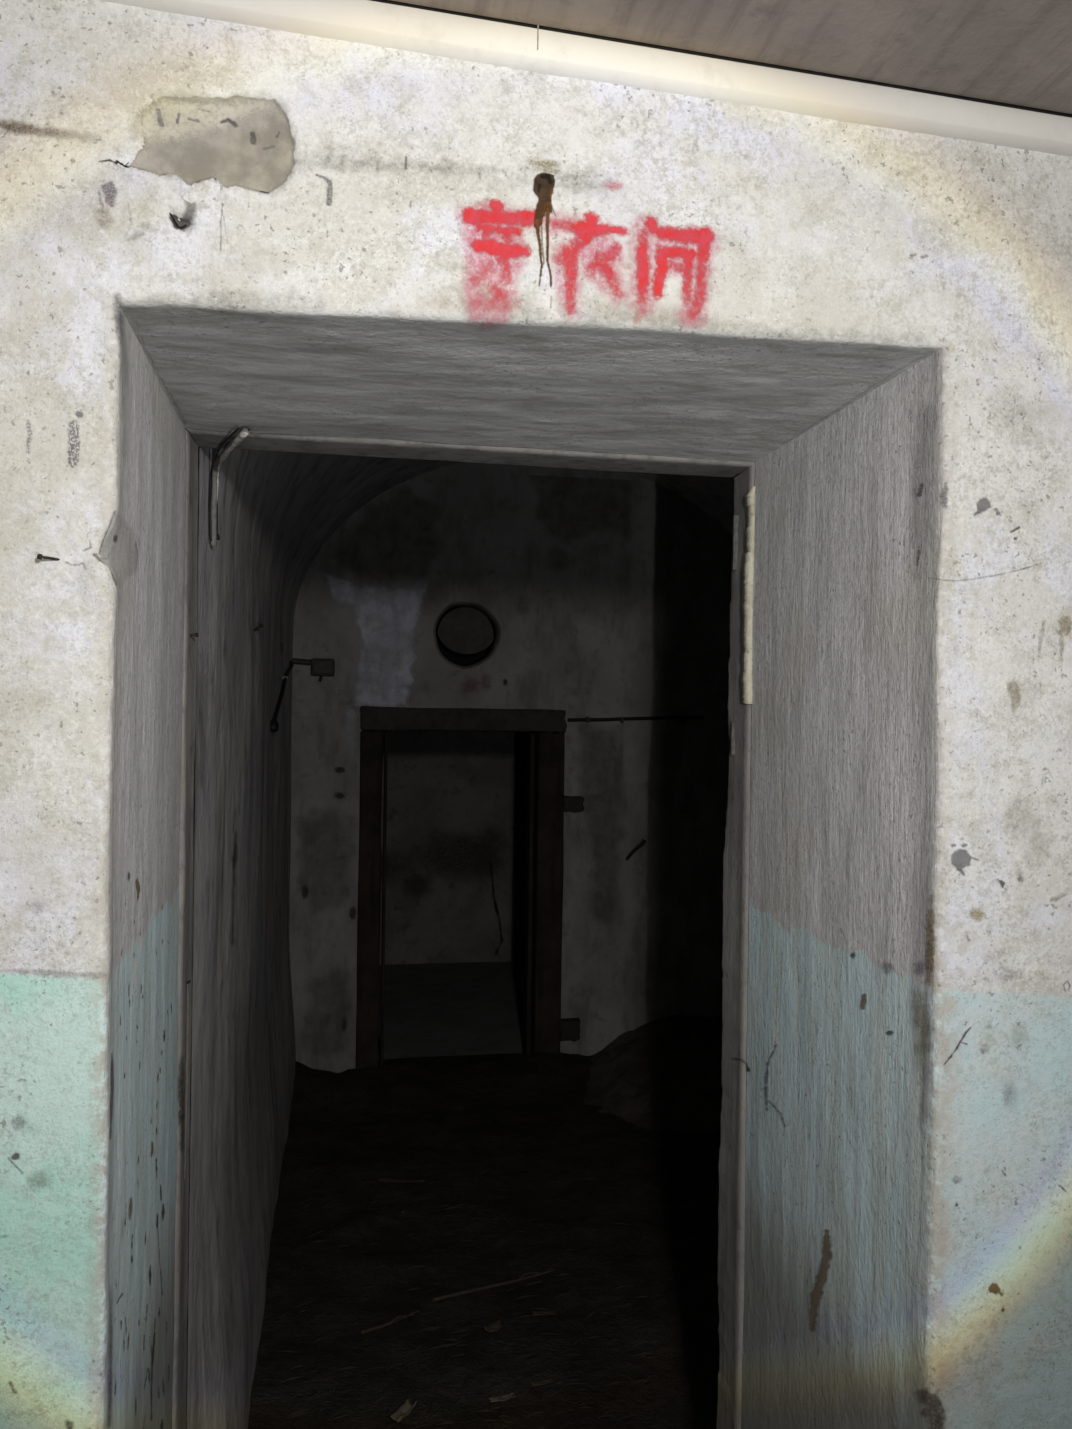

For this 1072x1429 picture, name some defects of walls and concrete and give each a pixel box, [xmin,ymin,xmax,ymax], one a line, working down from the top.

flaking render [99,96,295,230]
rust [534,173,555,286]
efflorescence [326,575,427,707]